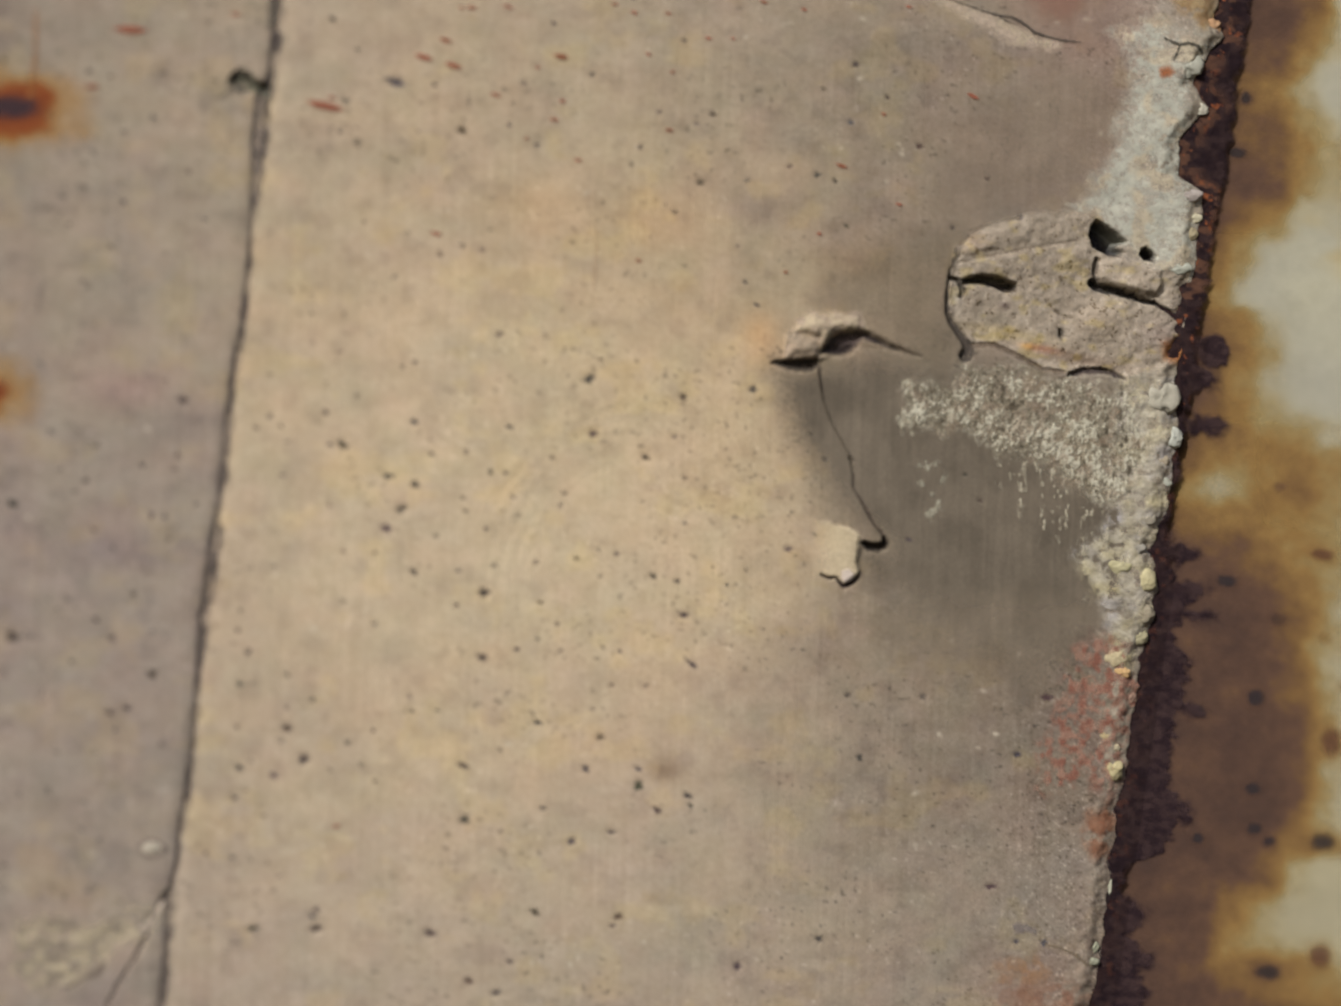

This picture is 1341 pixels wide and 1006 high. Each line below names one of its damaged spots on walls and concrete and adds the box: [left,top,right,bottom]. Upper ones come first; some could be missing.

corrosion [0,78,61,143]
corrosion [0,375,20,414]
spalling [902,0,1224,790]
crack [853,473,886,542]
leakage [786,358,1176,669]
corrosion [1117,0,1341,1006]
peeling [821,527,888,588]
corrosion [1041,640,1135,785]
spalling [1089,941,1100,966]